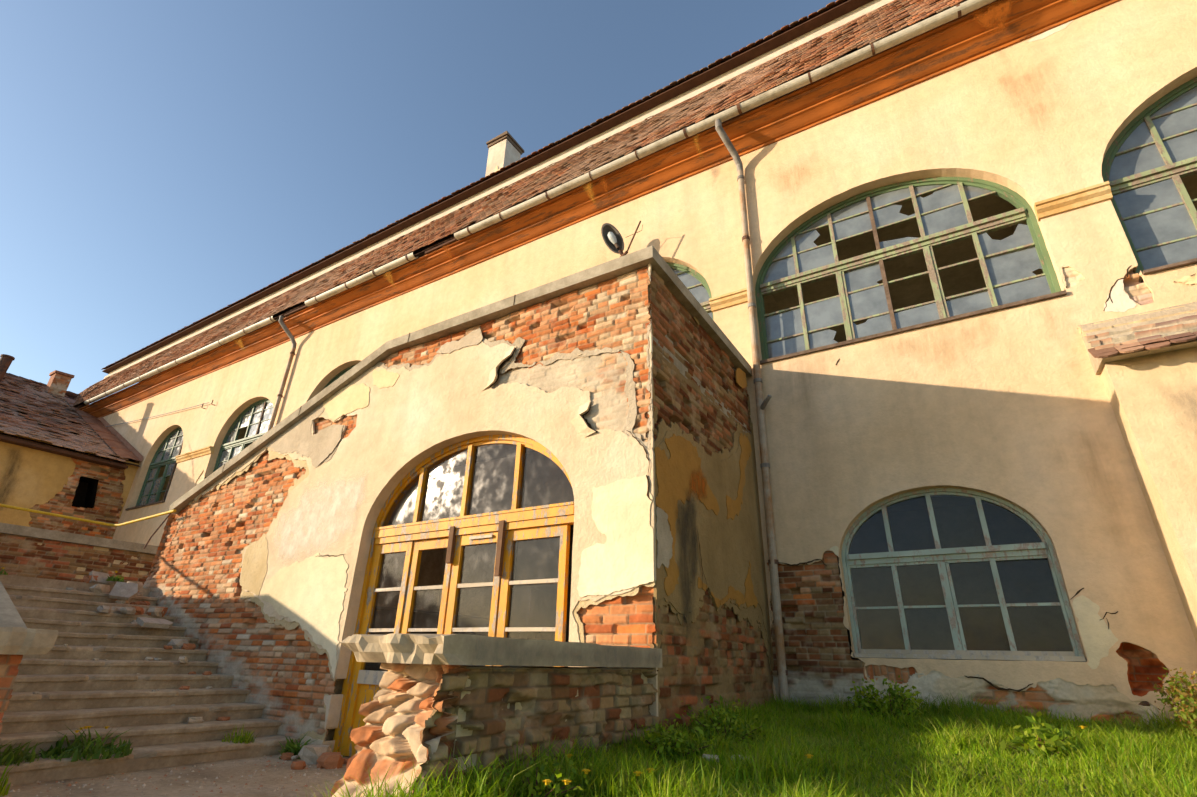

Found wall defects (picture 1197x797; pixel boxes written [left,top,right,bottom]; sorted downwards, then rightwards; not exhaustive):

flaking render [1104,268,1154,312]
flaking render [0,265,918,742]
leakage [679,496,697,623]
peeling [1072,595,1169,706]